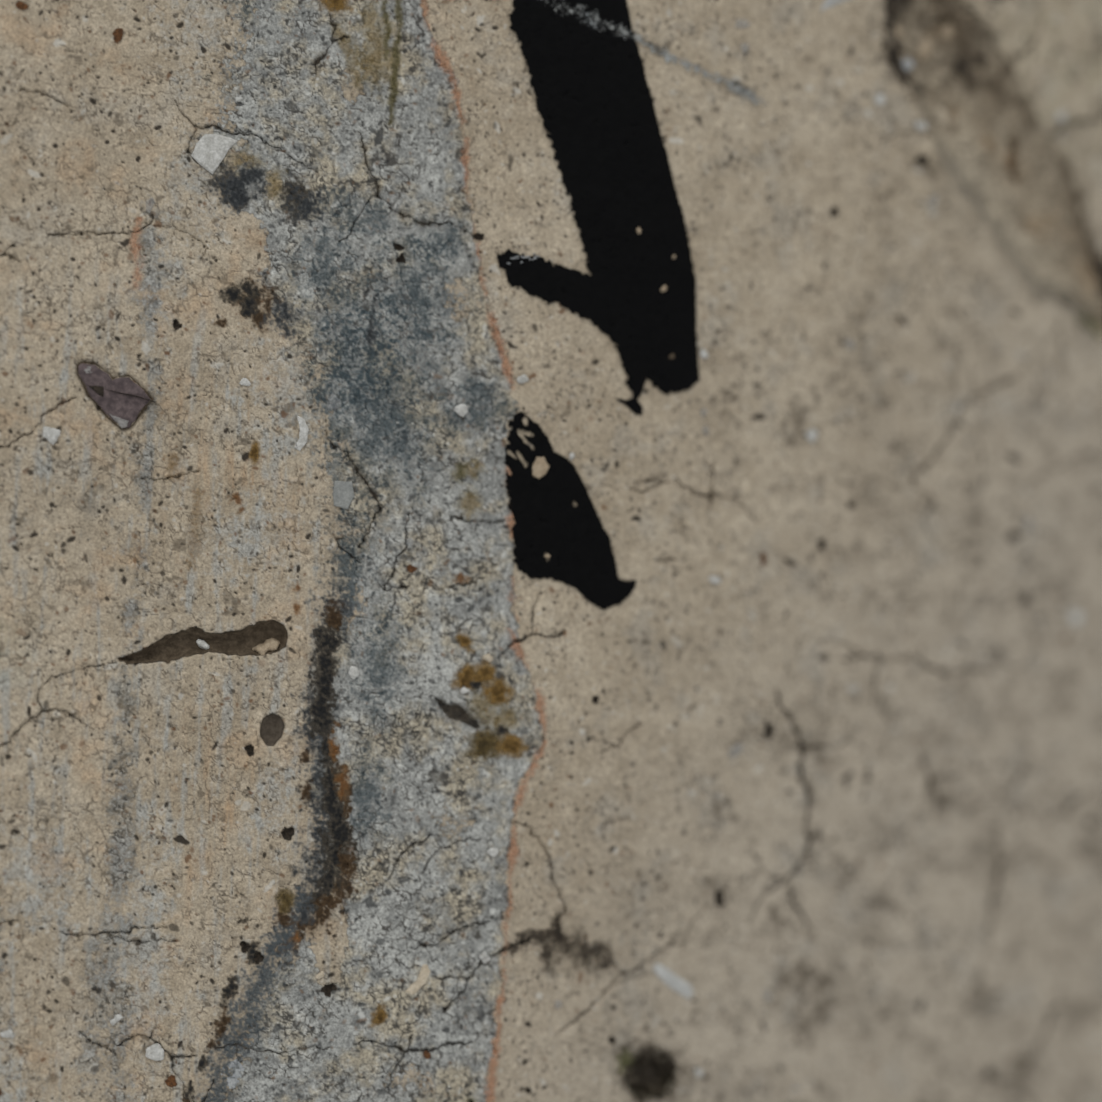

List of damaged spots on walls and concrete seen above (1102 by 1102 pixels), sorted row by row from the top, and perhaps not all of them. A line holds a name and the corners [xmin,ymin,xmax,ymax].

leakage [210,163,324,226]
spalling [884,0,1102,335]
leakage [220,278,302,337]
spalling [532,457,550,479]
peeling [191,0,545,1102]
crack [1,662,113,746]
spalling [118,620,287,723]
crack [749,691,870,930]
peeling [71,753,137,1102]
leakage [504,910,568,955]